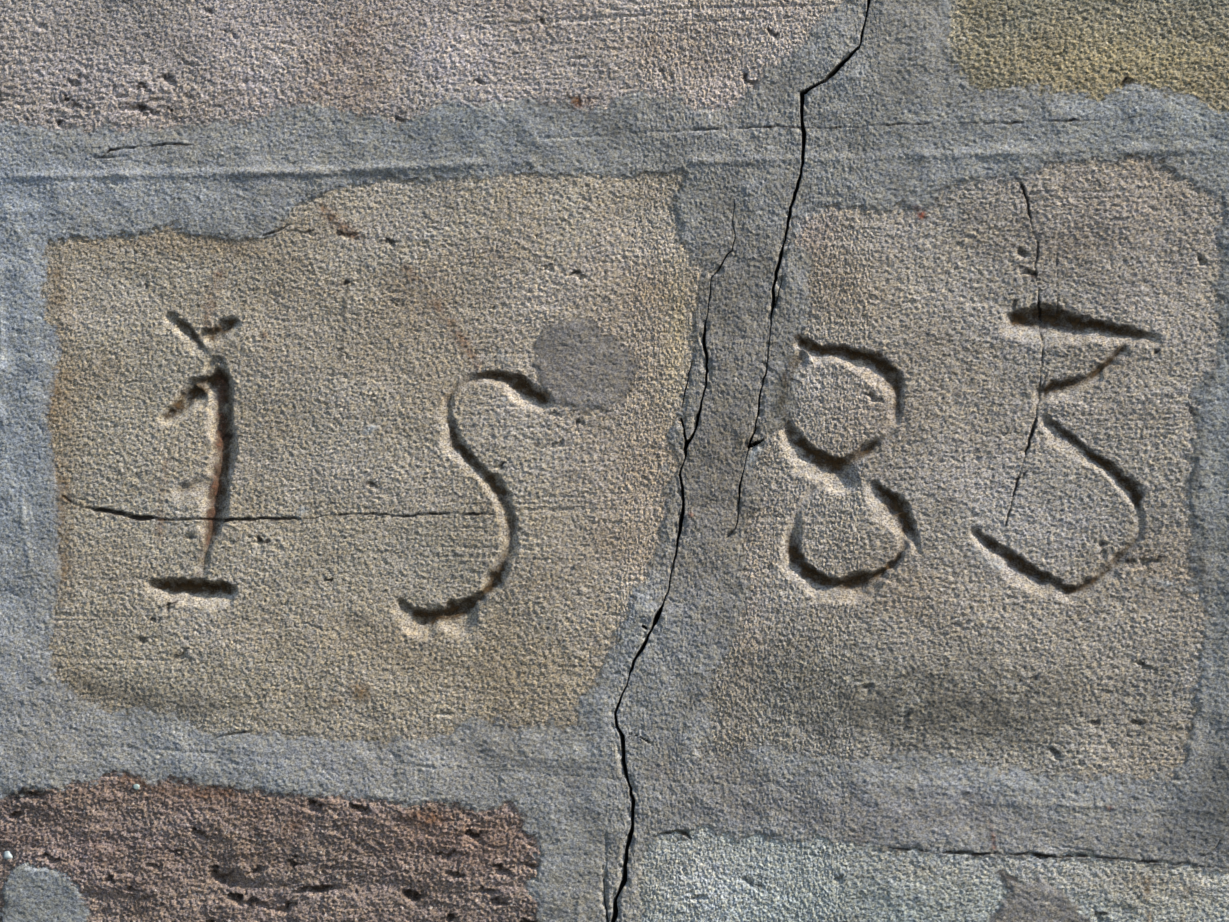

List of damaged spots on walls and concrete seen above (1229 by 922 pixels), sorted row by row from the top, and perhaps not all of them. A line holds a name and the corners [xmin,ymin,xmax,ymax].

crack [715,0,870,502]
crack [64,496,483,522]
crack [605,255,728,922]